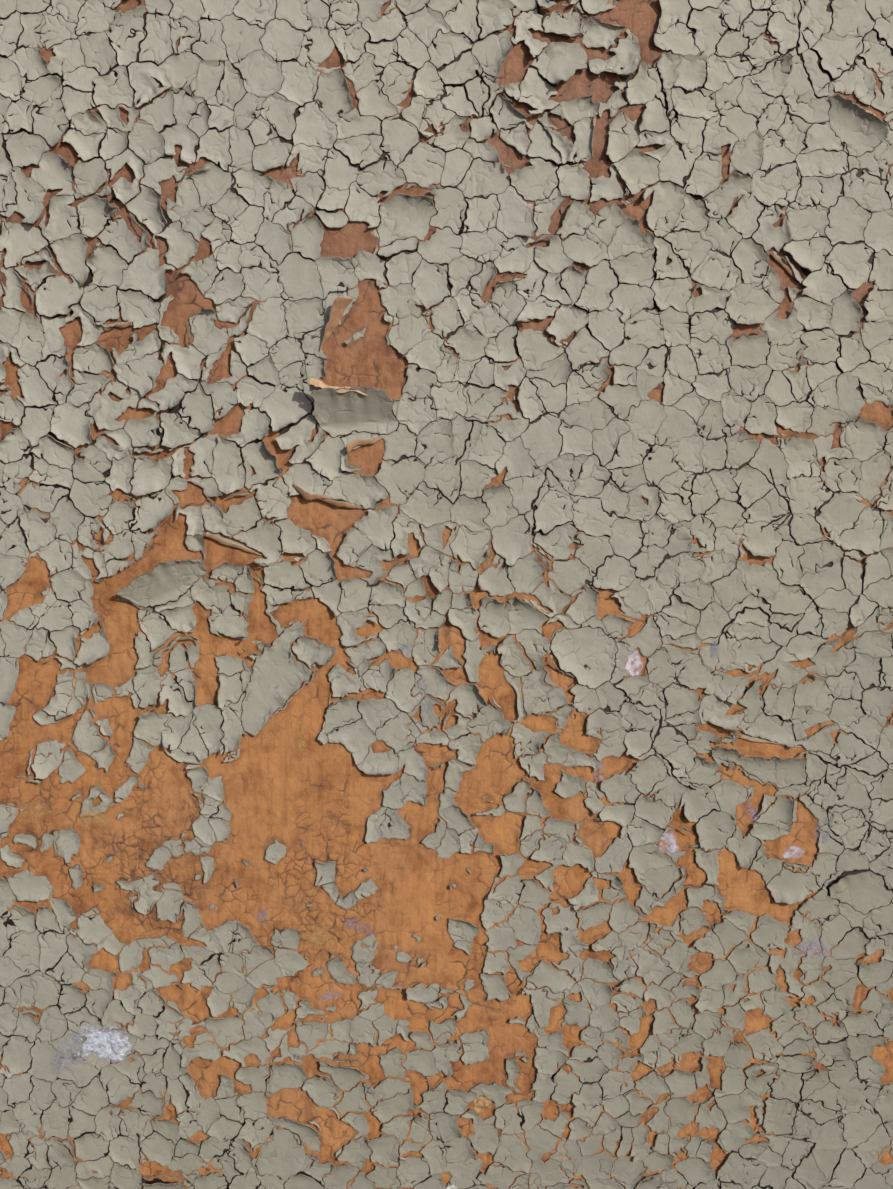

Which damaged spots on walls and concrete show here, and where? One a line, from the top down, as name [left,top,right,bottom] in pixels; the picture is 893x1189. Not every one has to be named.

peeling [419,0,757,187]
crack [0,0,692,569]
crack [0,462,85,658]
peeling [0,52,608,1189]
crack [559,0,893,962]
peeling [220,414,893,1189]
crack [0,1003,230,1189]
crack [397,1104,625,1189]
crack [759,1052,893,1189]